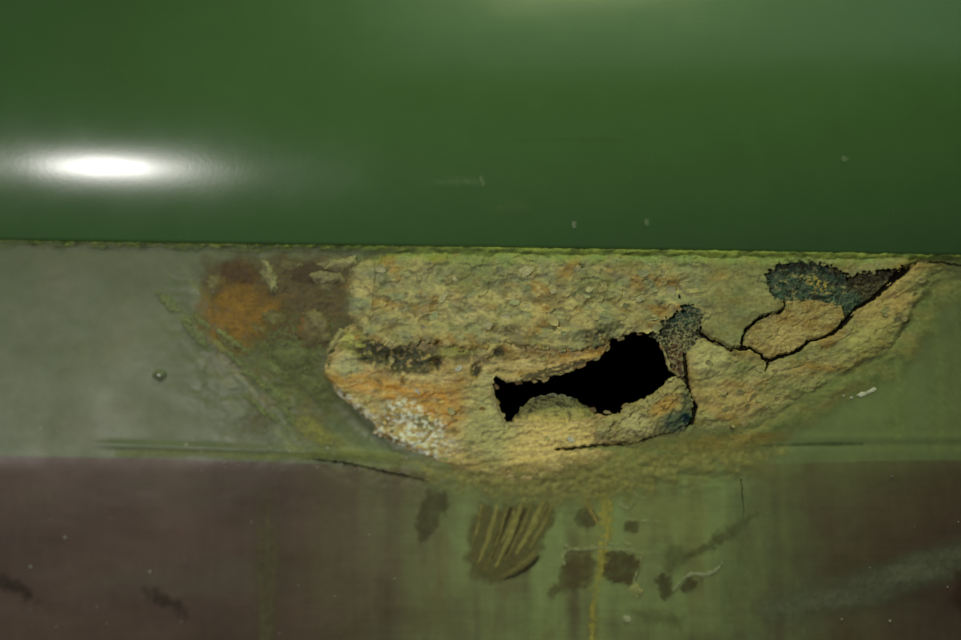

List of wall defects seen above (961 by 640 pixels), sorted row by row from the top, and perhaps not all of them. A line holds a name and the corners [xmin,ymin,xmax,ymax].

peeling [347,249,959,437]
crack [683,353,698,427]
crack [696,261,961,371]